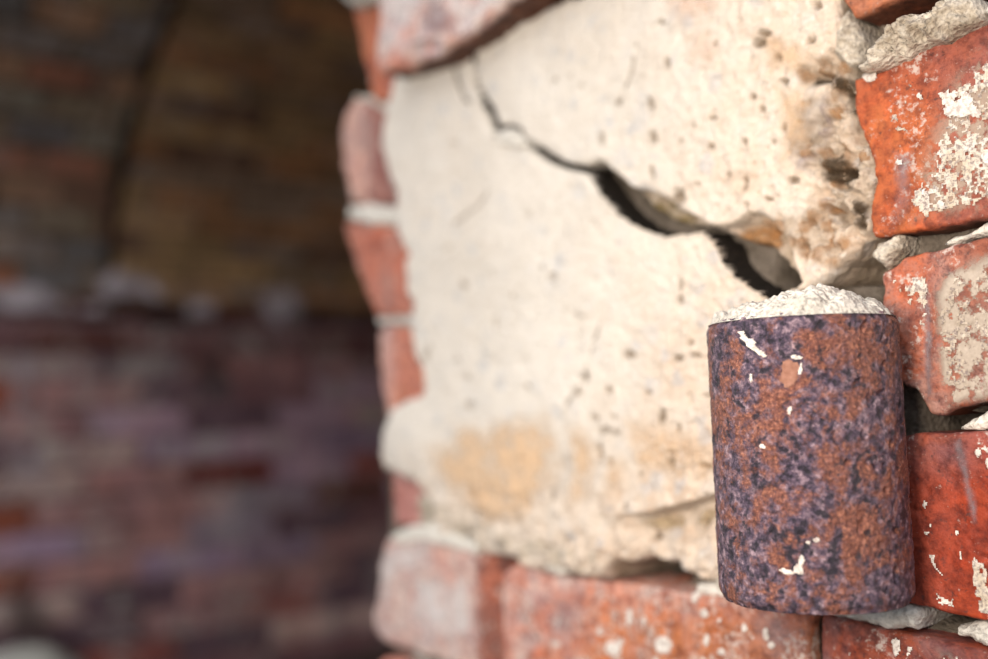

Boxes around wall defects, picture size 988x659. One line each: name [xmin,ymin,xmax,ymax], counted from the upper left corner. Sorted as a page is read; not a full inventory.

crack [454,58,785,298]
leakage [911,63,988,217]
corrosion [779,359,799,388]
leakage [893,271,988,394]